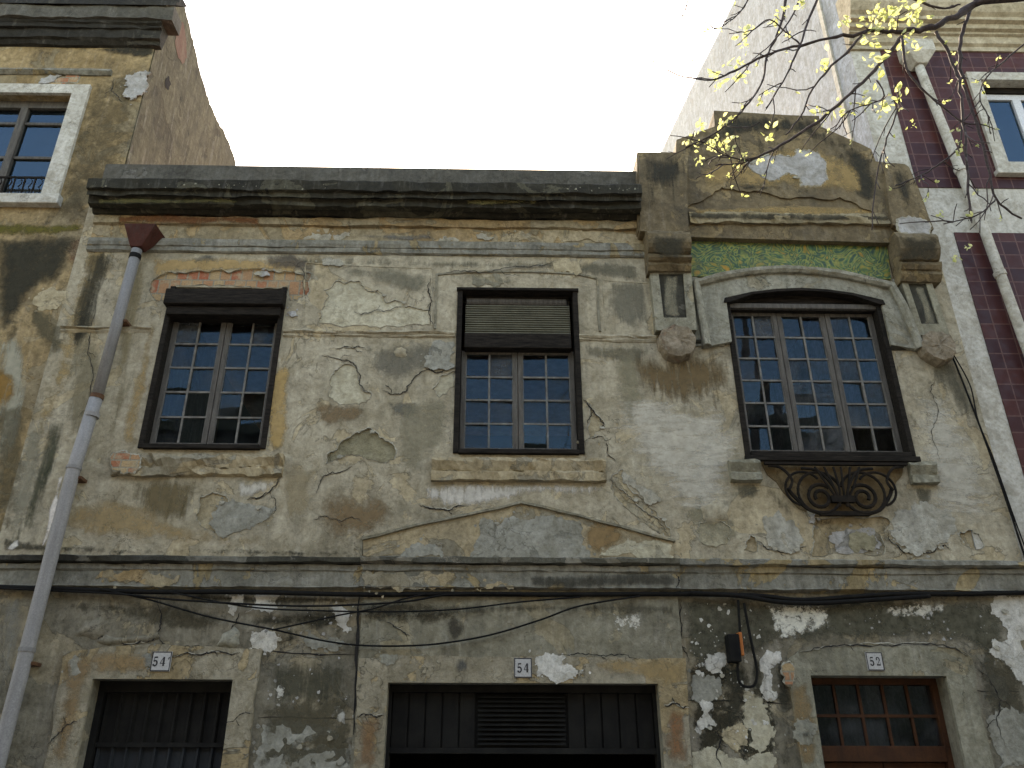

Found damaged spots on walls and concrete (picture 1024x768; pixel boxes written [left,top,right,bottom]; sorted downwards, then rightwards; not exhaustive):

peeling [123,70,151,105]
spalling [745,148,829,188]
damp [0,239,73,325]
spalling [148,256,344,317]
damp [33,252,109,425]
crack [322,346,455,395]
peeling [325,427,397,464]
crack [584,400,667,534]
damp [586,347,735,538]
peeling [807,511,891,557]
peeling [958,529,984,550]
crack [800,641,1010,745]